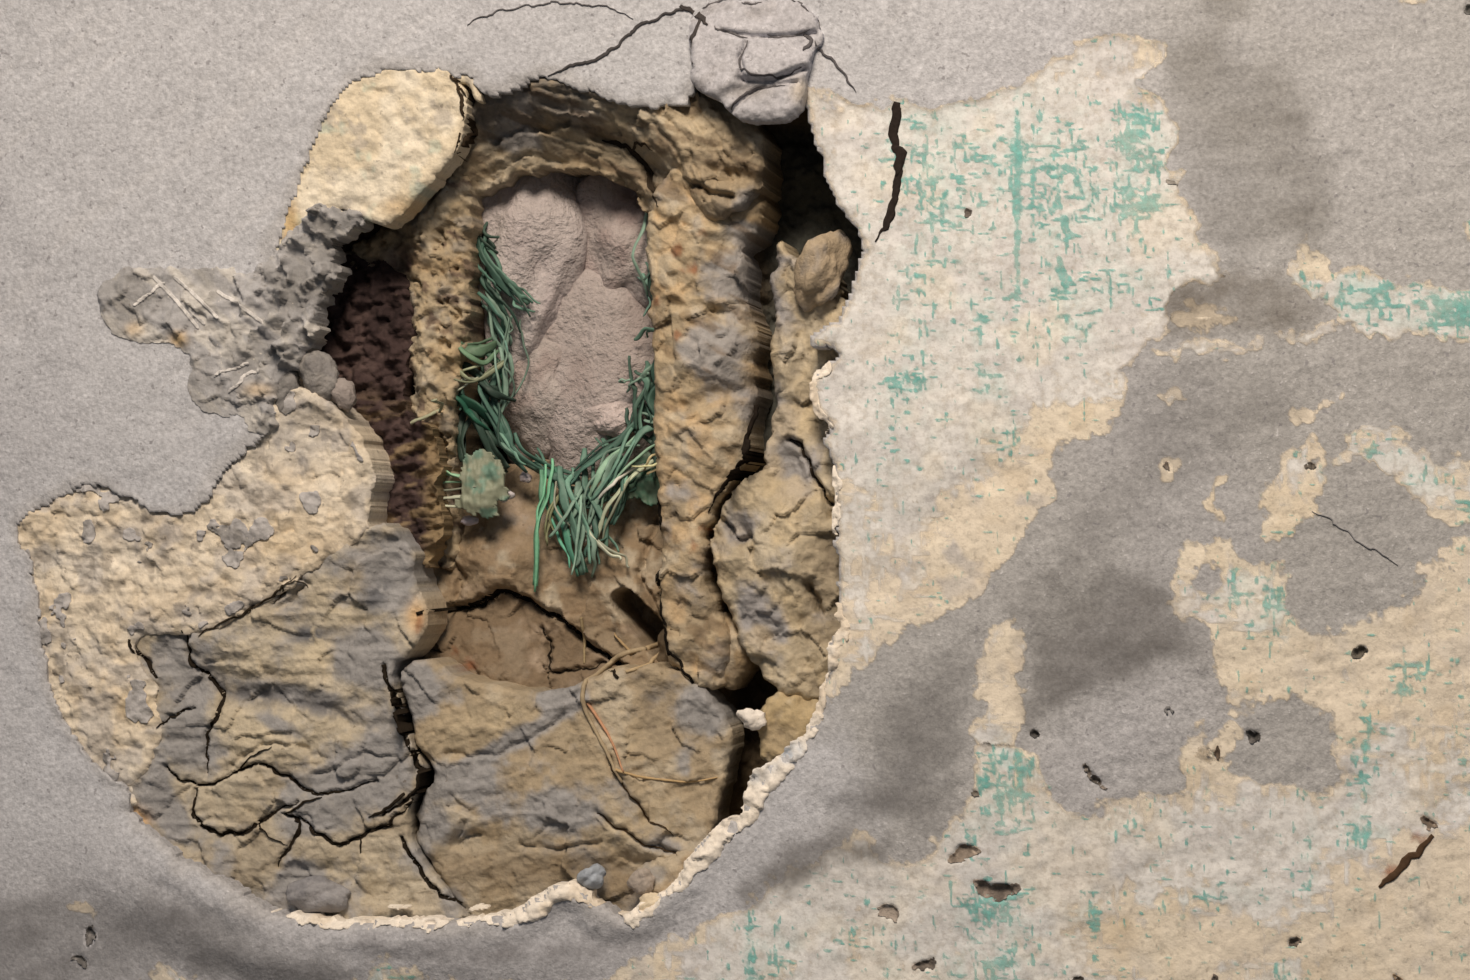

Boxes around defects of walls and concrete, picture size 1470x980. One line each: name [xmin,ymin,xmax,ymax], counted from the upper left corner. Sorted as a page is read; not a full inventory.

crack [467,0,856,110]
crack [875,101,907,242]
peeling [1278,244,1470,345]
spalling [18,33,1264,933]
crack [128,576,463,903]
crack [416,589,625,679]
crack [655,570,694,684]
peeling [610,393,1470,980]
crack [597,766,677,855]
peeling [67,901,97,968]
peeling [148,962,197,980]
peeling [353,953,424,980]